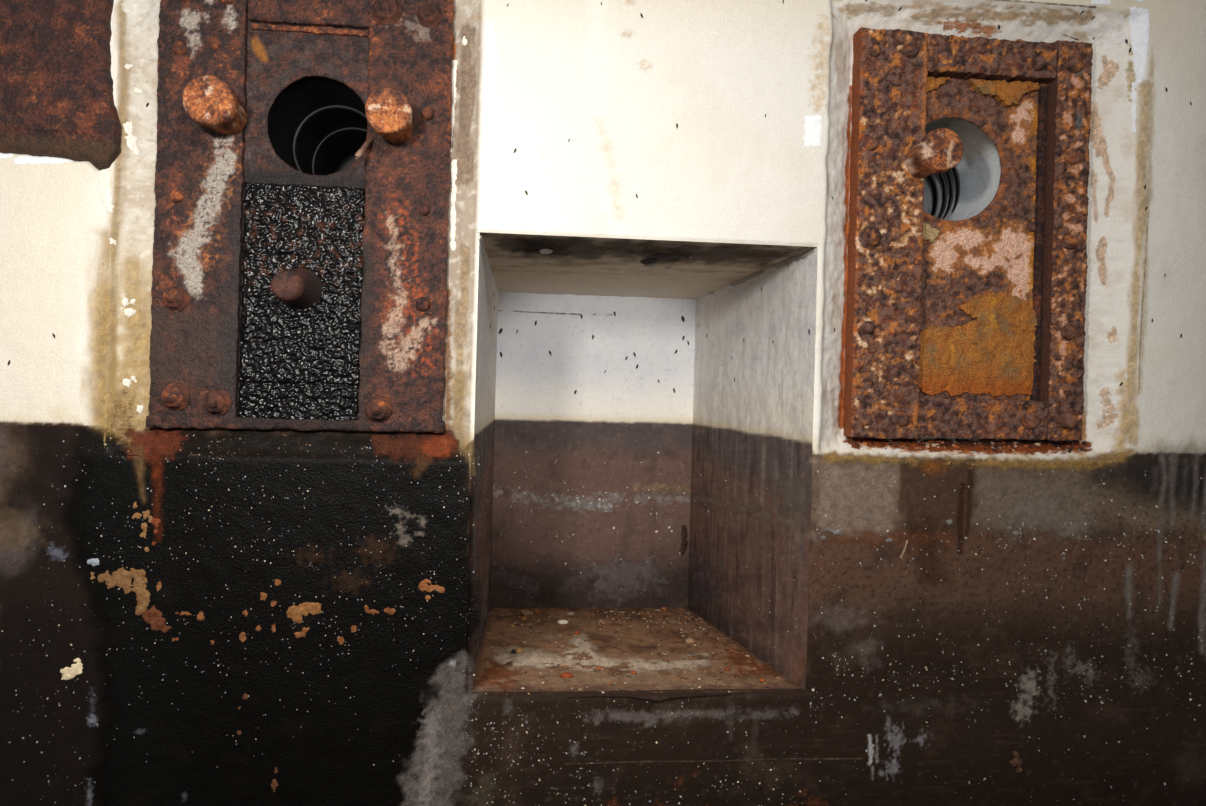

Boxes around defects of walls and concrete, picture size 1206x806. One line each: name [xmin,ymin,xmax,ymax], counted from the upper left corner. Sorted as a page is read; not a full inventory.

rust [926,77,950,93]
rust [967,78,1040,107]
leakage [0,2,804,806]
rust [371,290,459,476]
rust [838,86,1092,581]
leakage [813,65,1206,537]
rust [125,428,183,537]
leakage [868,705,926,779]
leakage [1014,667,1054,720]